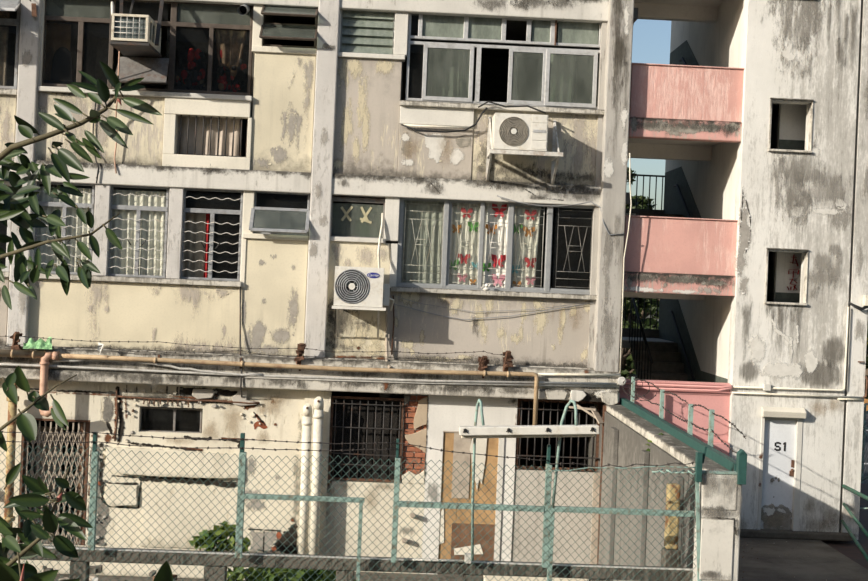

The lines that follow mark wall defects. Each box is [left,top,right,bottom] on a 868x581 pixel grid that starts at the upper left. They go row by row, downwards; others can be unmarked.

damp [474,0,571,10]
damp [769,0,856,78]
peeling [253,58,313,168]
peeling [400,132,414,166]
peeling [424,116,488,165]
damp [670,121,738,136]
damp [774,145,848,229]
damp [628,274,724,289]
spalling [401,394,428,484]